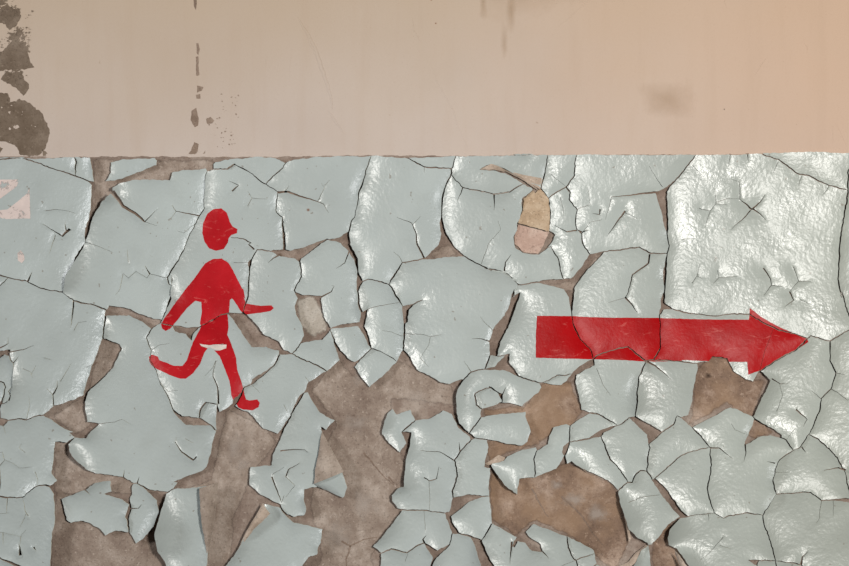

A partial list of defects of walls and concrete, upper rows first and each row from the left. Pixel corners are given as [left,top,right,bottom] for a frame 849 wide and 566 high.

peeling [191,86,234,147]
peeling [0,152,849,566]